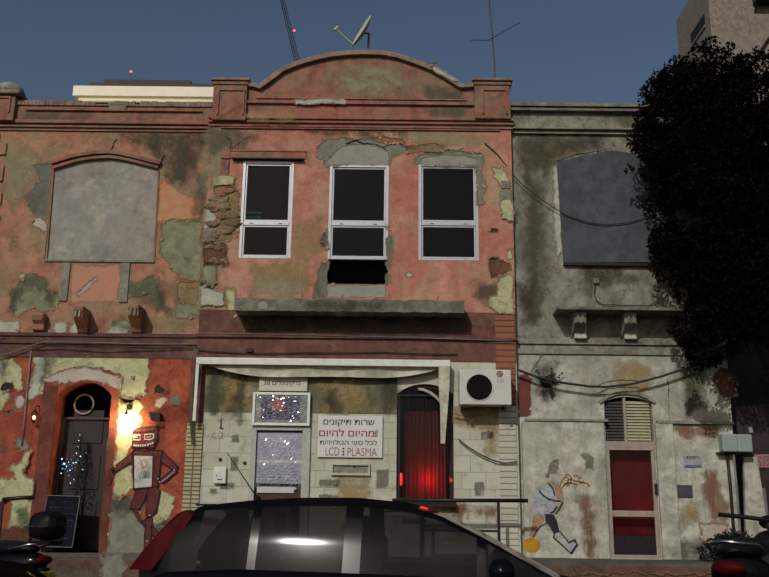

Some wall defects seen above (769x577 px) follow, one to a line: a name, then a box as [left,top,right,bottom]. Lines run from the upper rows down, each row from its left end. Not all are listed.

flaking render [23,160,53,232]
flaking render [315,134,516,222]
flaking render [0,272,78,333]
peeling [70,264,160,304]
peeling [104,319,131,333]
flaking render [157,173,243,319]
flaking render [301,226,394,300]
flaking render [488,247,515,315]
flaking render [0,347,181,577]
corrosion [703,470,729,522]